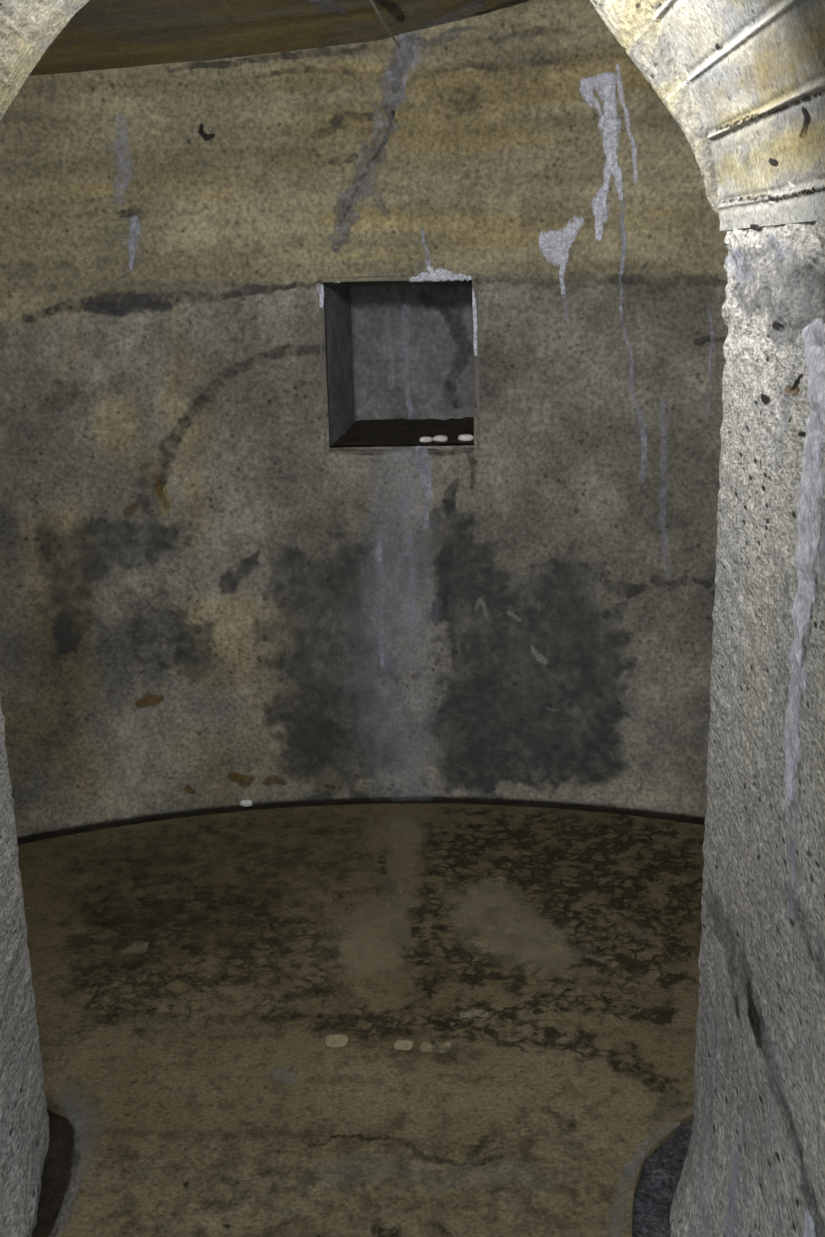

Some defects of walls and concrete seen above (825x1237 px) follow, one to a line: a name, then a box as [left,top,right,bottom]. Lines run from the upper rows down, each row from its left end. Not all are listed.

crack [328,0,528,252]
efflorescence [539,64,638,311]
leakage [36,517,191,609]
leakage [263,536,417,801]
leakage [407,446,634,794]
leakage [726,238,825,821]
leakage [73,804,704,1092]